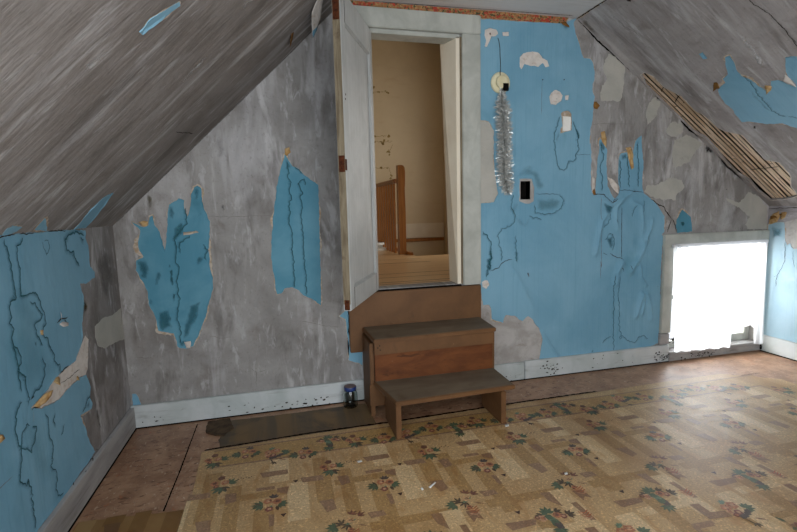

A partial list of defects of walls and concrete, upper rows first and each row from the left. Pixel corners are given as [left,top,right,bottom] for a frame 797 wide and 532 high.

flaking render [769,211,797,249]
peeling [34,376,61,407]